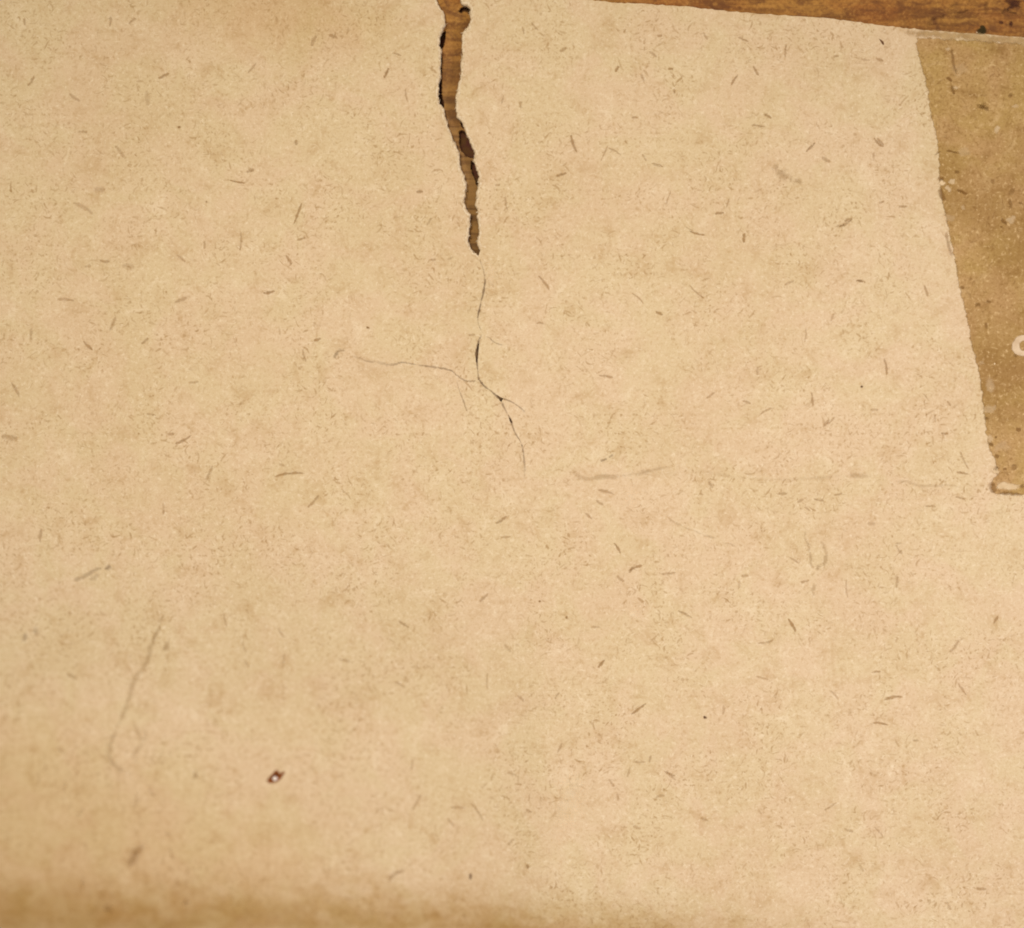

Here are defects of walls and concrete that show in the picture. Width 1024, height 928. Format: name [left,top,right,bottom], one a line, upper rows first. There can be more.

crack [435,0,482,257]